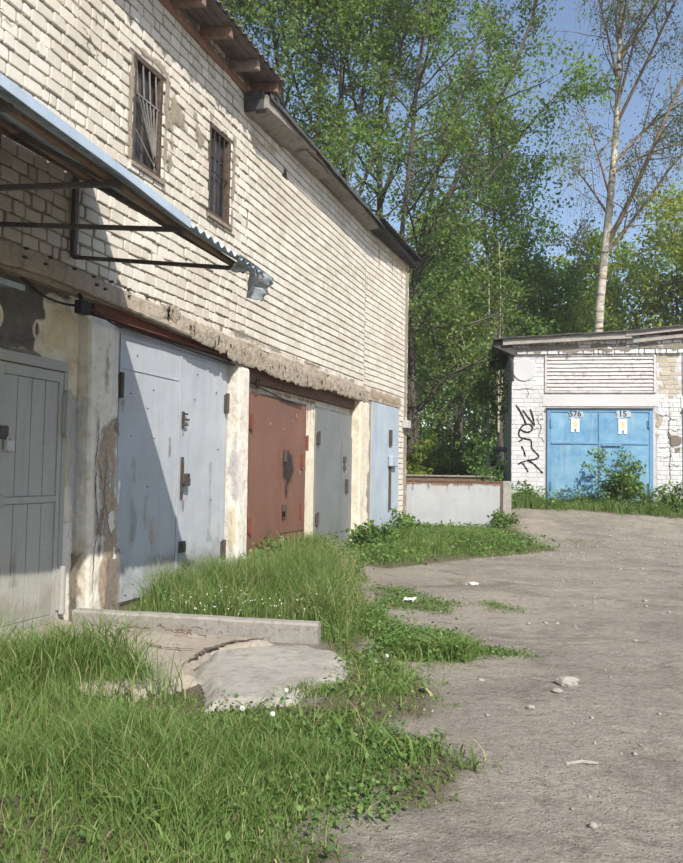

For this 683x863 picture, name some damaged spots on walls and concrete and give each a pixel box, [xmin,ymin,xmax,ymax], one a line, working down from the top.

spalling [161,303,367,401]
peeling [656,414,682,453]
crack [659,404,680,488]
crack [147,637,264,664]